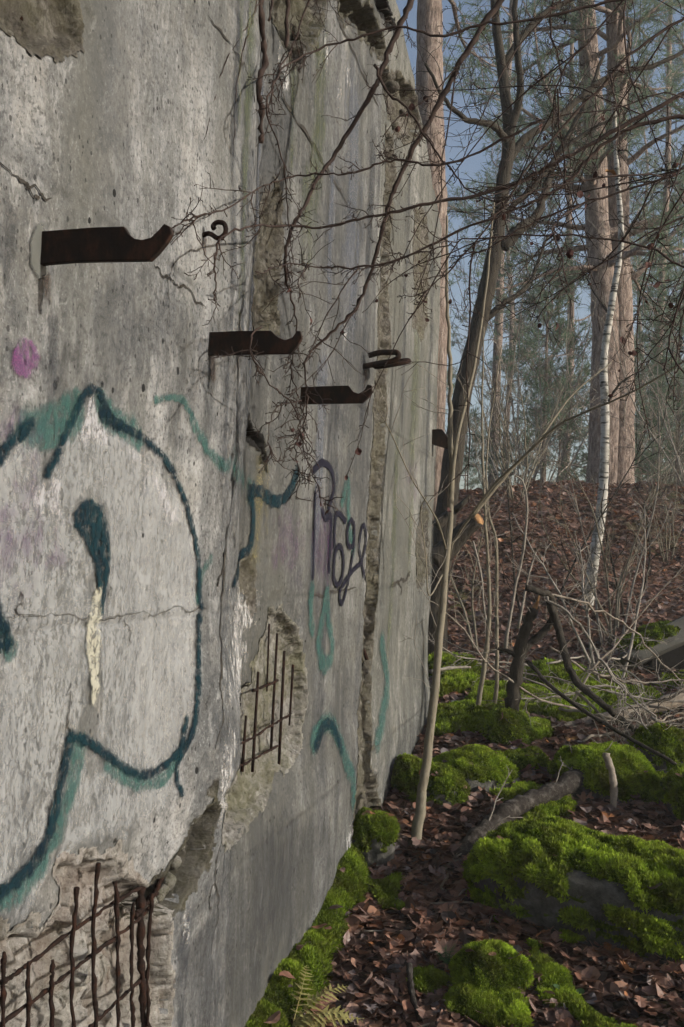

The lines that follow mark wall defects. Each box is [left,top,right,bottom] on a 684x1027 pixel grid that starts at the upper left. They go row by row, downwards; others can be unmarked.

spalling [0,0,85,63]
crack [0,162,52,202]
spalling [250,176,284,336]
spalling [269,0,422,844]
crack [6,298,268,749]
spalling [219,554,309,853]
spalling [0,839,189,1027]